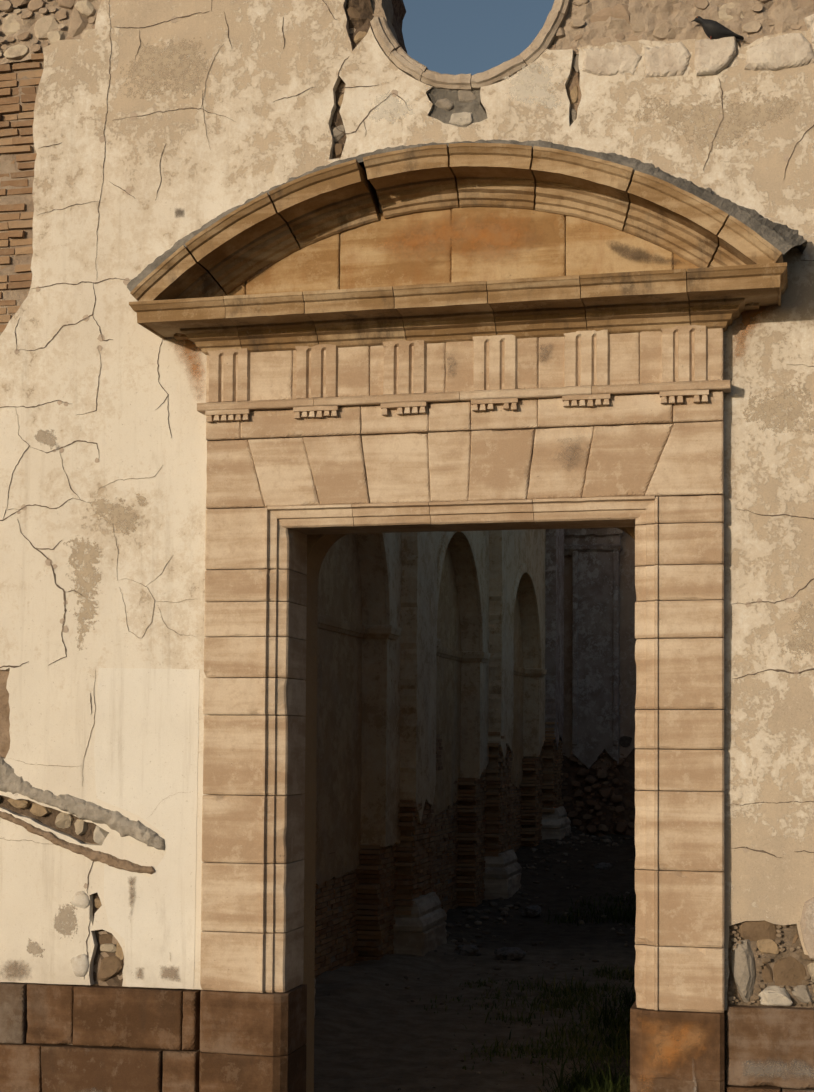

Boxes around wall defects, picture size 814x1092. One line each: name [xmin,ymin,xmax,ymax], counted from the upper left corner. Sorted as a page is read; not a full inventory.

spalling [345,0,374,50]
spalling [428,87,487,127]
crack [783,125,814,178]
flaking render [0,53,44,332]
crack [0,0,235,668]
crack [740,509,814,520]
crack [735,578,814,607]
crack [734,668,814,679]
spalling [0,669,10,758]
crack [733,847,814,858]
spalling [93,929,124,986]
spalling [725,920,814,1011]